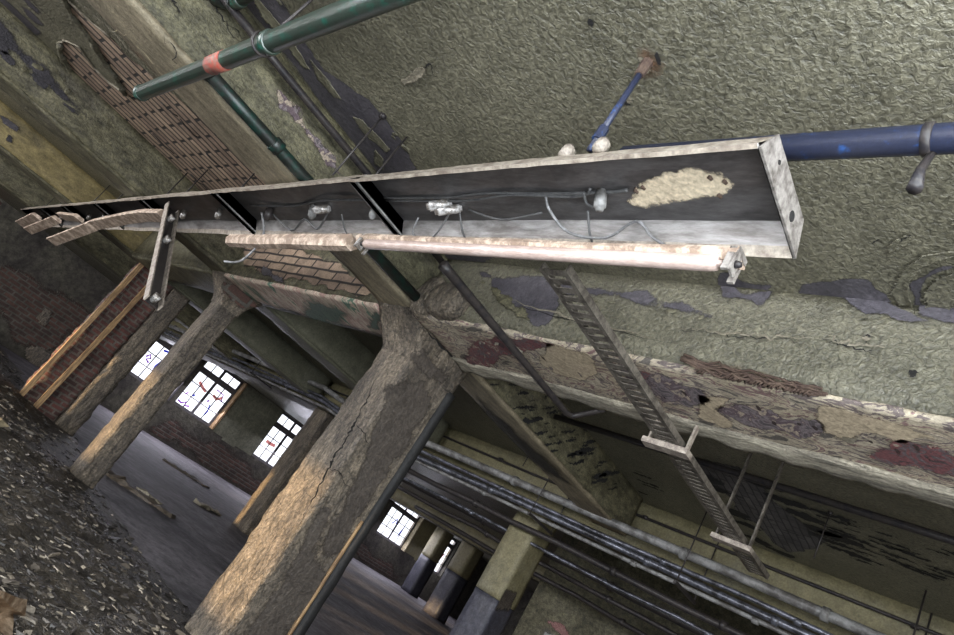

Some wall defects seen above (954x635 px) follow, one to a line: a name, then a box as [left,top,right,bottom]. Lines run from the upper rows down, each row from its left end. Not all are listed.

peeling [0,115,19,143]
peeling [0,20,91,120]
flaking render [56,0,266,191]
peeling [247,0,293,29]
peeling [276,42,417,174]
peeling [799,251,954,323]
crack [297,383,374,529]
peeling [620,365,954,477]